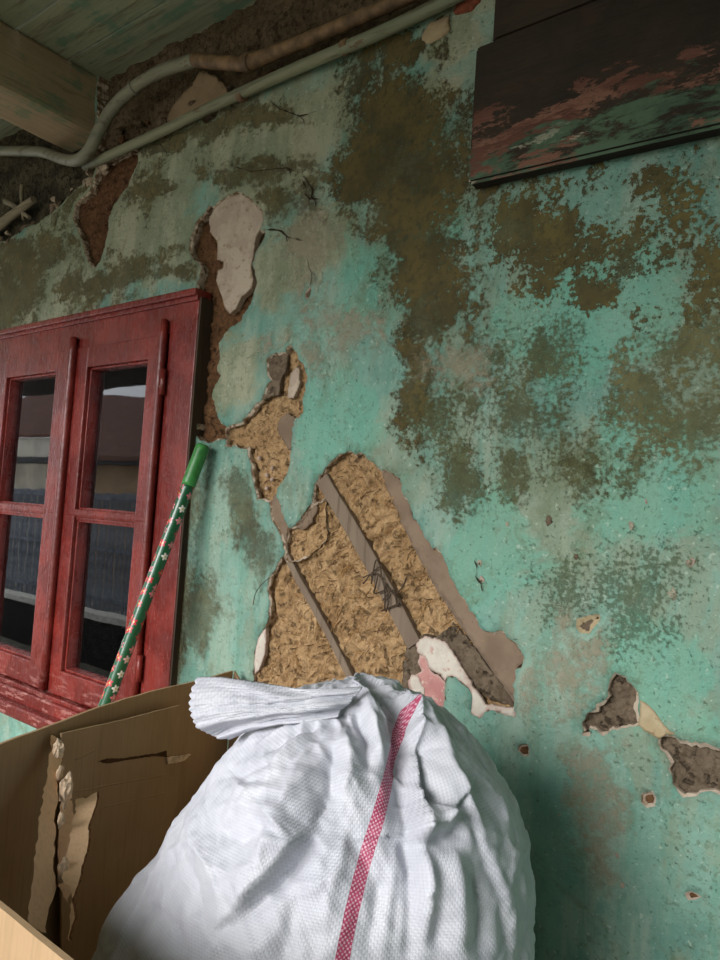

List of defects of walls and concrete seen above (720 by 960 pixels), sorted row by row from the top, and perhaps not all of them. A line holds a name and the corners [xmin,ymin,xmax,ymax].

spalling [0,0,429,269]
water stain [325,26,720,529]
spalling [189,191,524,719]
spalling [576,614,600,633]
spalling [518,744,529,756]
spalling [641,791,656,807]
spalling [581,672,720,798]